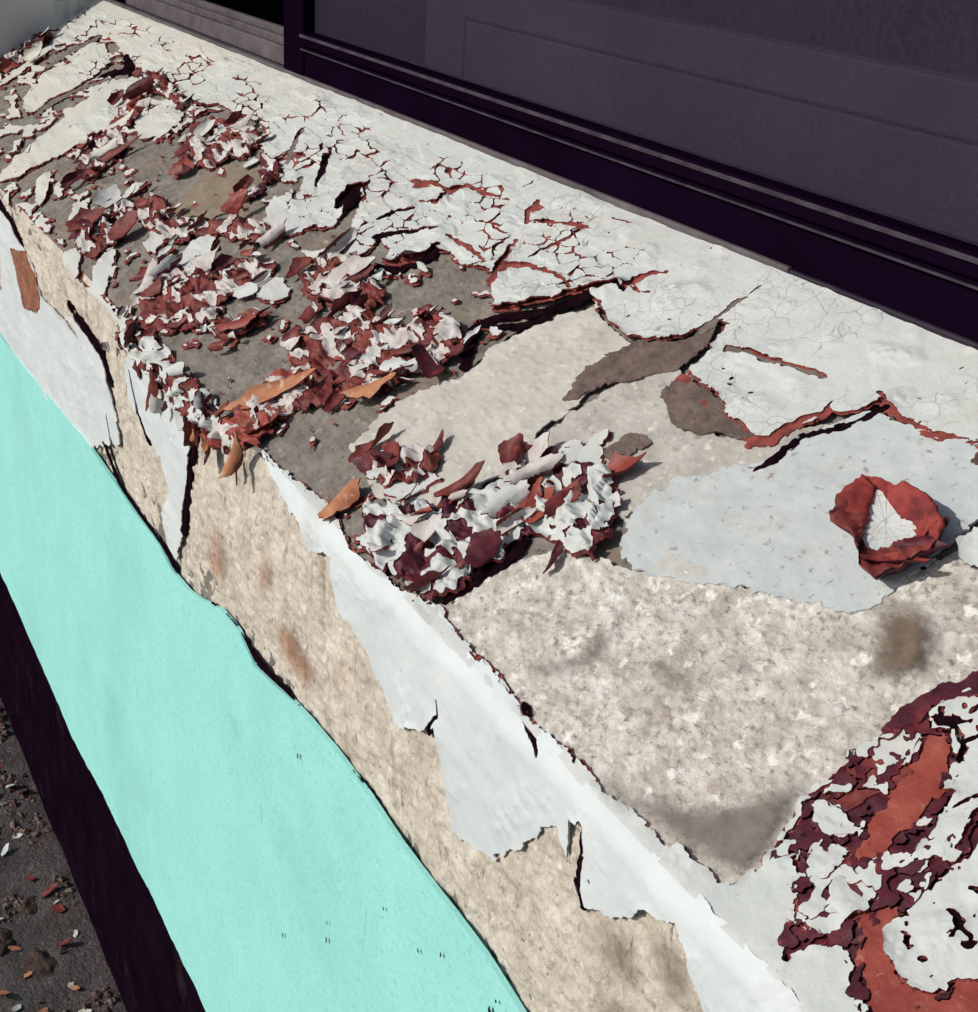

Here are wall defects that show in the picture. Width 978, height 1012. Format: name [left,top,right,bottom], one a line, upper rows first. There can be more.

peeling [0,36,129,174]
crack [284,127,330,200]
crack [335,188,369,212]
peeling [0,67,285,539]
crack [366,181,595,371]
crack [618,273,667,292]
crack [697,286,827,379]
crack [674,374,978,472]
flaking render [110,180,978,1012]
water stain [874,611,927,671]
crack [929,705,978,758]